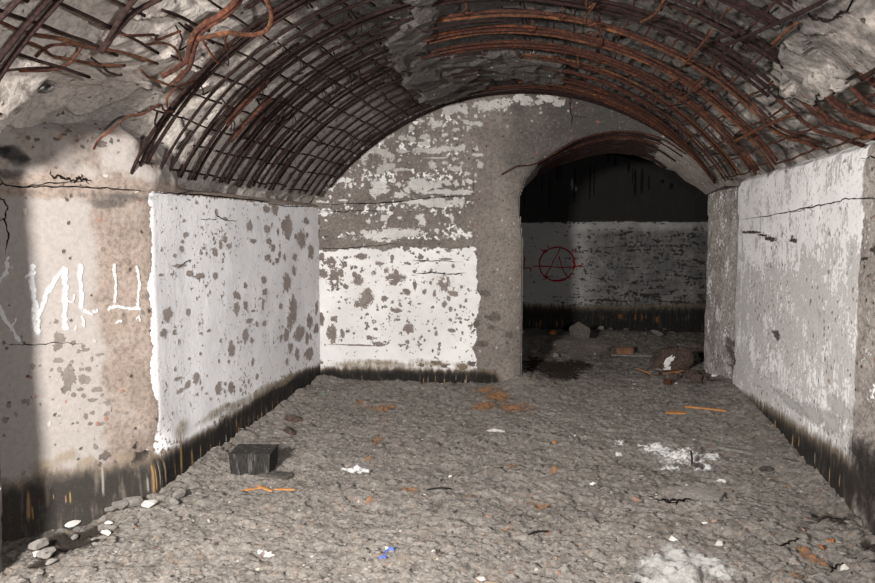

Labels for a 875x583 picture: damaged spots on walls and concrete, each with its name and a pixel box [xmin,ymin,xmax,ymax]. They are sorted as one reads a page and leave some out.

crack [0,170,474,255]
crack [737,197,875,220]
crack [416,260,461,275]
leakage [522,302,706,333]
peeling [30,319,116,426]
leakage [1,360,500,568]
leakage [744,391,875,552]